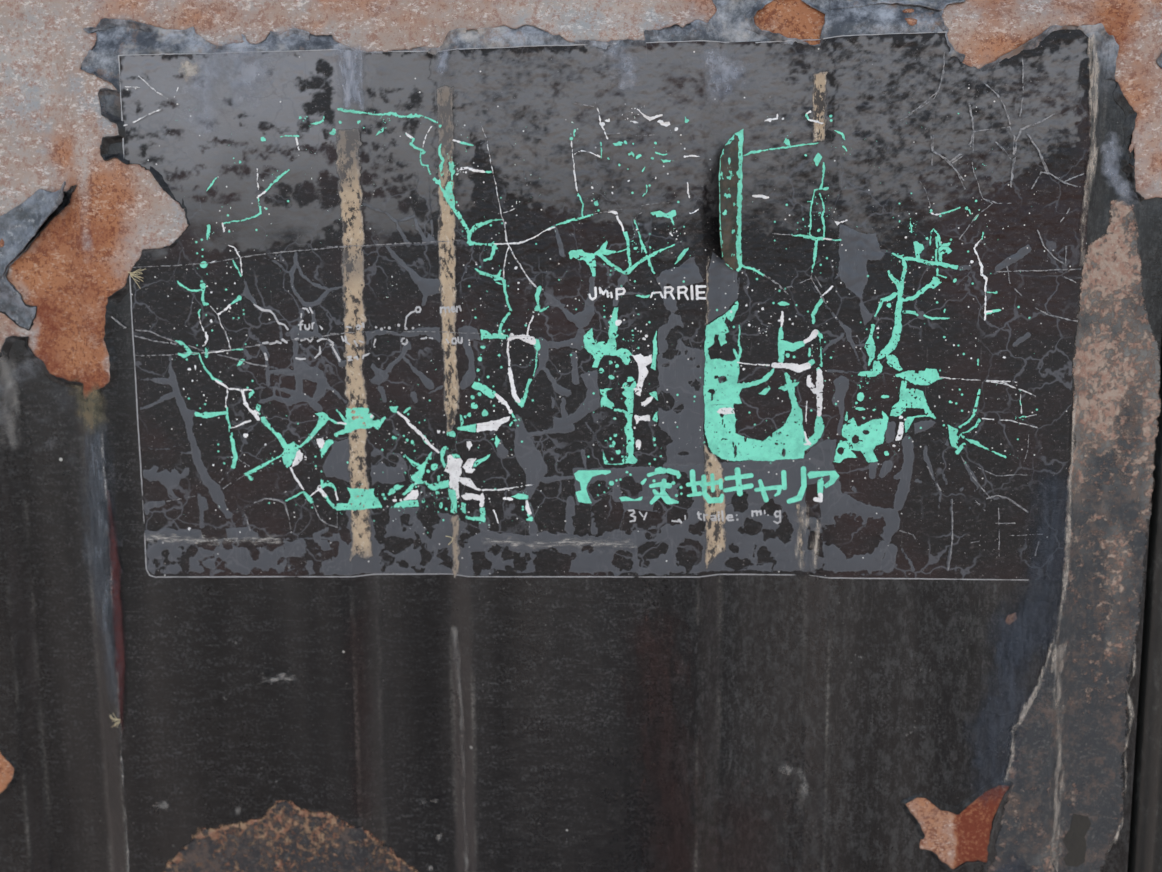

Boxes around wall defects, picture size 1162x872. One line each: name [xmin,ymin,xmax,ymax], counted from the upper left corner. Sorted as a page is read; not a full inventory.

peeling [182,60,200,80]
rust [744,0,833,46]
peeling [0,181,66,330]
rust [0,0,723,431]
crack [482,128,538,289]
peeling [718,129,744,272]
crack [919,59,1084,322]
crack [111,306,480,367]
crack [927,377,1043,570]
rust [900,0,1162,872]
rust [164,800,418,872]
peeling [1063,814,1091,867]